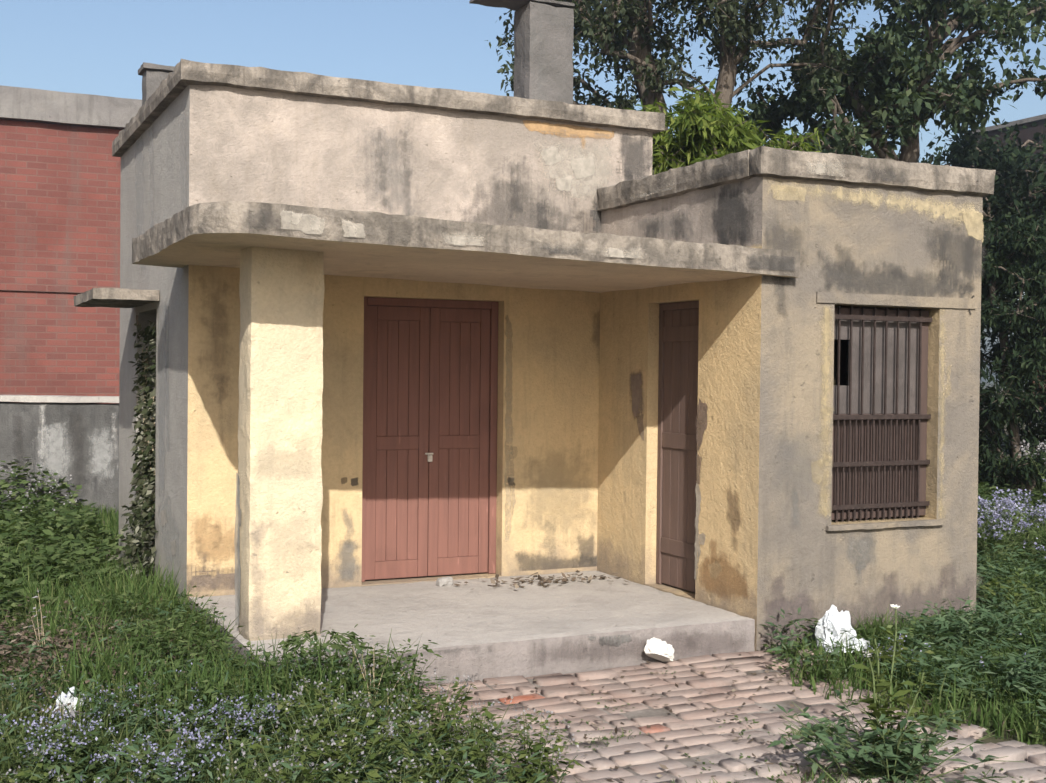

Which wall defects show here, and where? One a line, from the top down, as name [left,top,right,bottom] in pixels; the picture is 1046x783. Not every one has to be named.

leakage [622,135,652,180]
leakage [342,219,365,238]
leakage [580,201,602,233]
leakage [712,164,750,246]
leakage [748,255,794,271]
leakage [826,264,973,297]
spalling [630,372,643,418]
spalling [694,399,708,579]
leakage [341,542,355,579]
leakage [519,555,596,570]